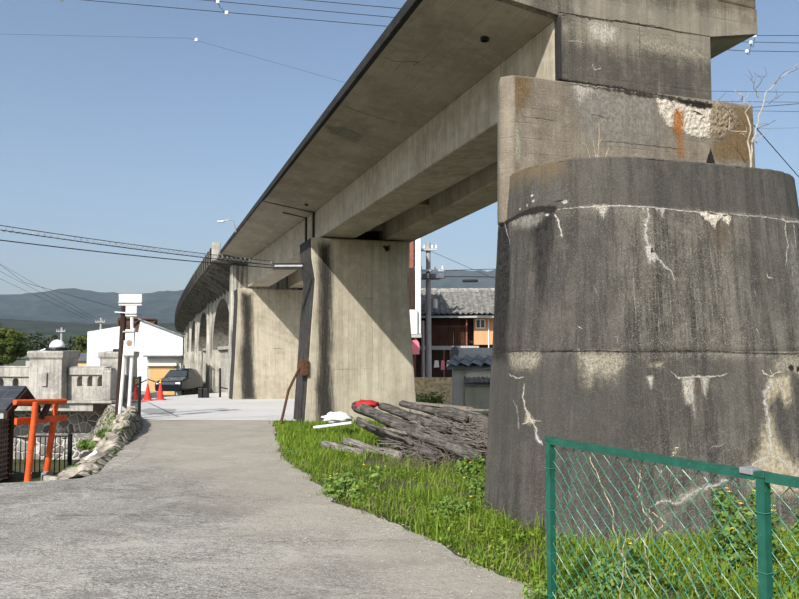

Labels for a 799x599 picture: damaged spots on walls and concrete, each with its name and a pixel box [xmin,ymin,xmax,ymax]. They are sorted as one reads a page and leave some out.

rust [674,111,682,153]
spalling [655,96,738,140]
leakage [241,293,255,399]
leakage [316,243,335,420]
crack [502,292,799,496]
crack [651,479,728,507]